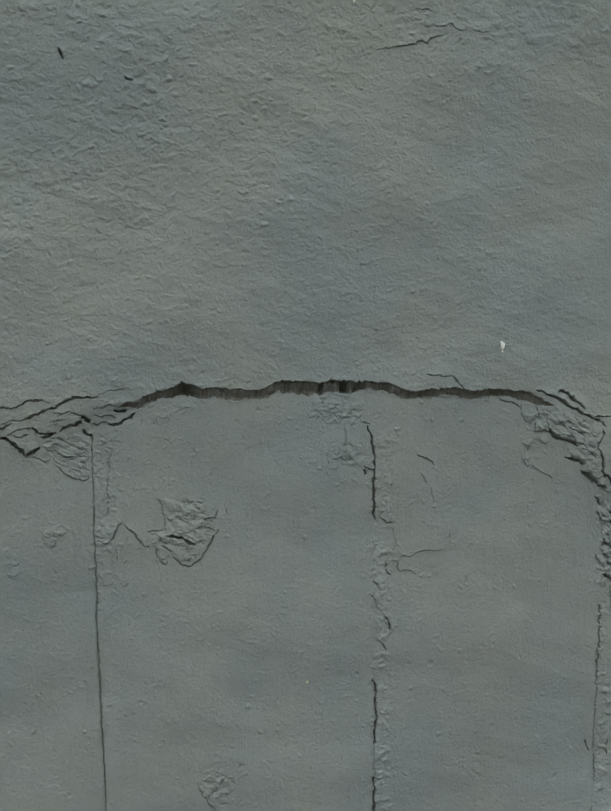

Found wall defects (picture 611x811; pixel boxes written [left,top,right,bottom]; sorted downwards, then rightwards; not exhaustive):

crack [375,7,492,51]
spalling [38,429,93,482]
spalling [520,402,611,583]
spalling [122,495,230,569]
crack [0,373,611,811]